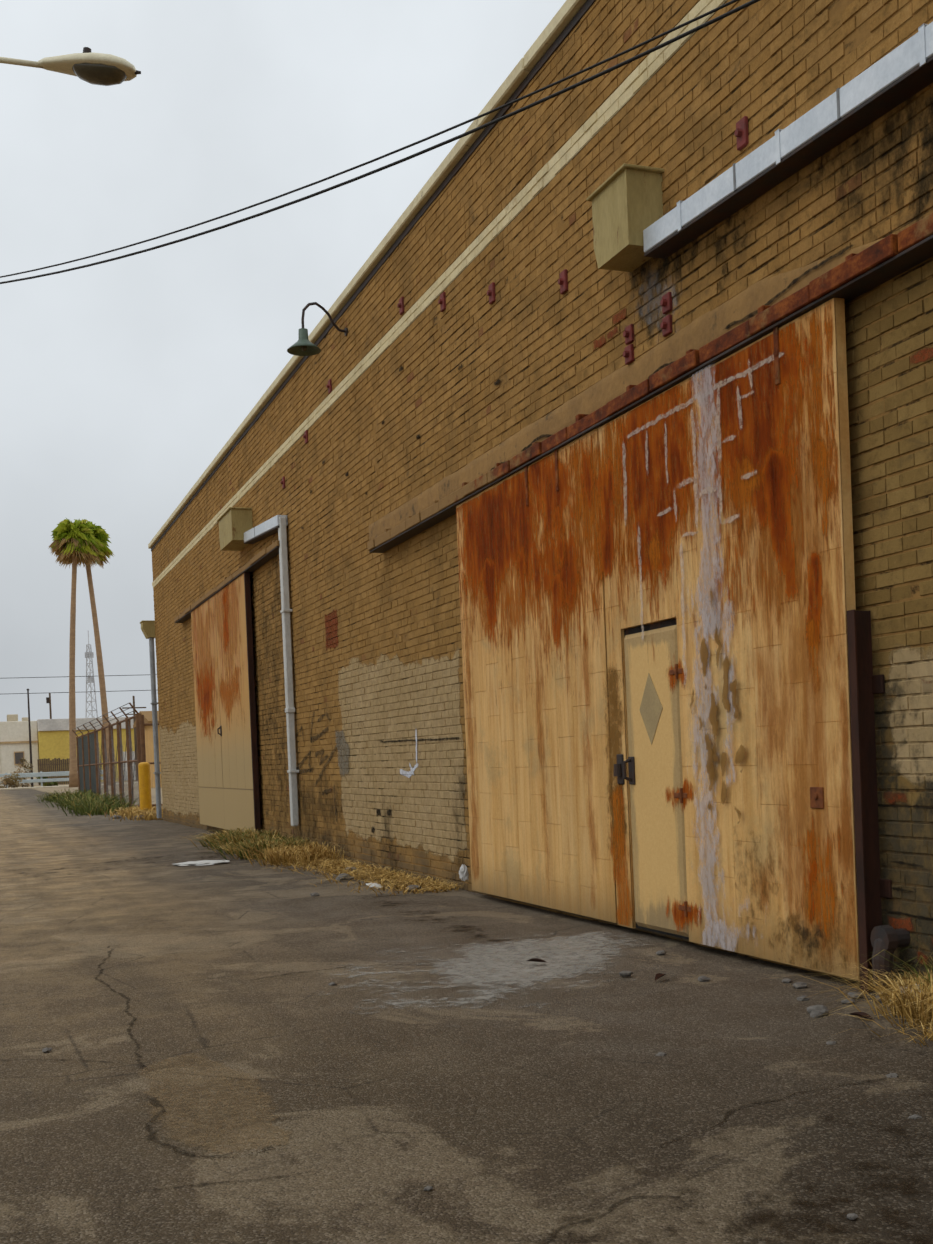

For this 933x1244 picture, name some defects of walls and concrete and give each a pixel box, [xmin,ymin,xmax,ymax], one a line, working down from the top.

damp [916,134,933,205]
rust [193,584,242,736]
rust [456,307,852,950]
damp [690,366,735,948]
damp [874,683,933,980]
spalling [885,910,933,931]